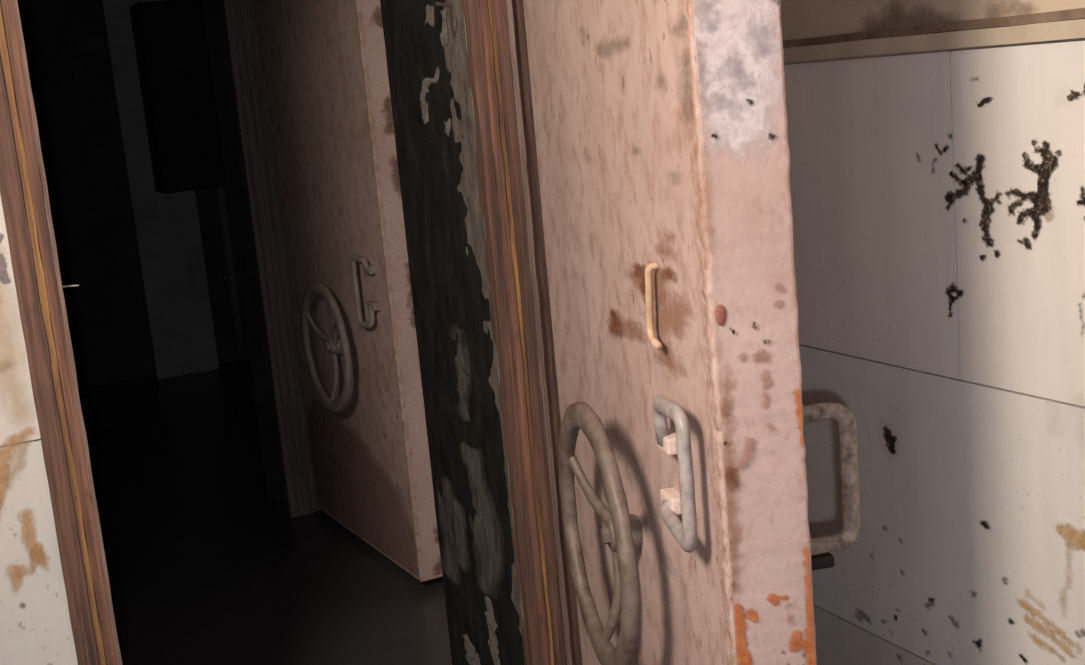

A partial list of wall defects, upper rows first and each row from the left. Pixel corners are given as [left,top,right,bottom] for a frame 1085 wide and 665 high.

peeling [693,0,782,154]
peeling [0,254,10,284]
corrosion [0,429,32,508]
corrosion [10,512,46,590]
corrosion [1056,524,1085,549]
corrosion [734,604,758,665]
corrosion [768,594,788,605]
corrosion [1019,600,1072,659]